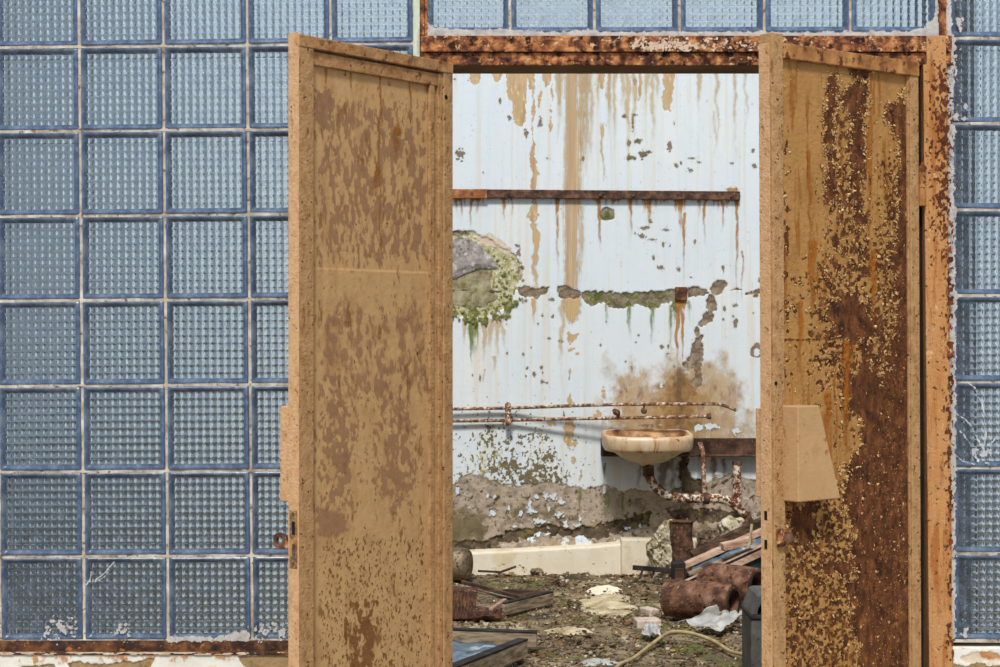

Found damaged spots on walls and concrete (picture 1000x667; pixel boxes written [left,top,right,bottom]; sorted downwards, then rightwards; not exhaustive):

spalling [453,229,675,318]
rust [784,68,909,667]
rust [929,59,955,666]
damp [453,505,488,545]
damp [453,411,594,522]
spalling [453,420,761,549]
rust [317,533,427,667]